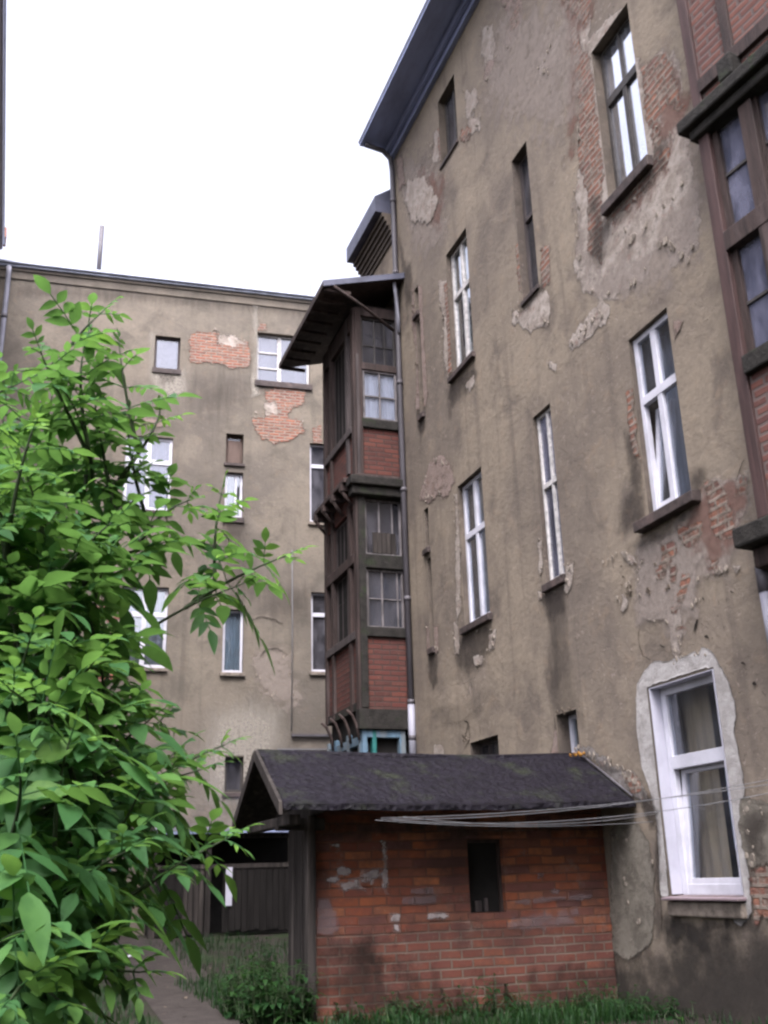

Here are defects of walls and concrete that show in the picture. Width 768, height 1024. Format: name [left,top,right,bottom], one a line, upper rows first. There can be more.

peeling [459,23,496,143]
peeling [396,128,441,225]
peeling [537,0,702,351]
flaking render [188,328,251,370]
spalling [511,244,551,334]
flaking render [252,387,323,444]
peeling [419,455,461,623]
peeling [602,474,748,662]